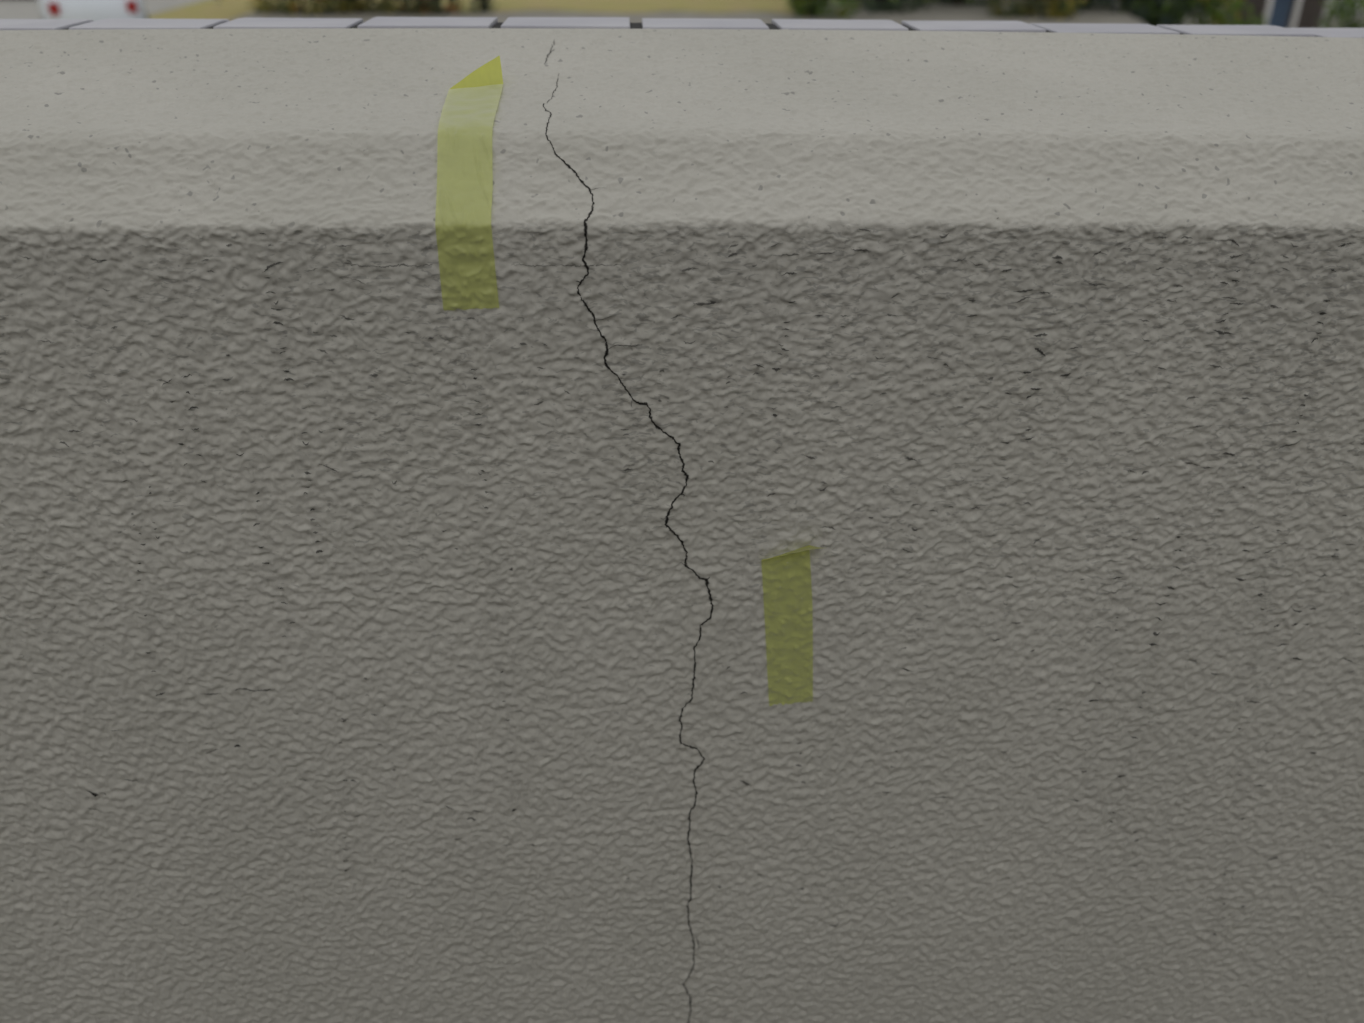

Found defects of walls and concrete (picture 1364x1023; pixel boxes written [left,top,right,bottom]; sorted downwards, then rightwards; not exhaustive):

crack [525,41,714,1023]